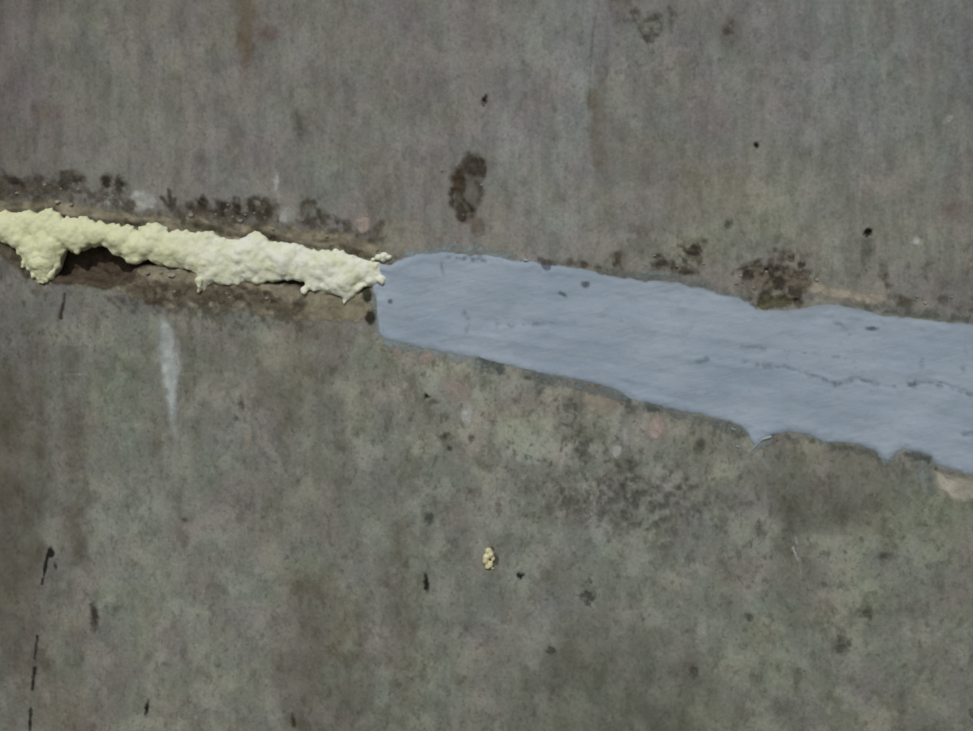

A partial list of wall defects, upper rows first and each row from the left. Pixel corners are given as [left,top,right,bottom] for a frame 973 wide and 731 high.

spalling [0,172,85,203]
spalling [101,175,124,203]
spalling [188,197,274,225]
spalling [441,155,486,230]
crack [0,180,393,324]
spalling [735,253,820,309]
damp [159,320,180,413]